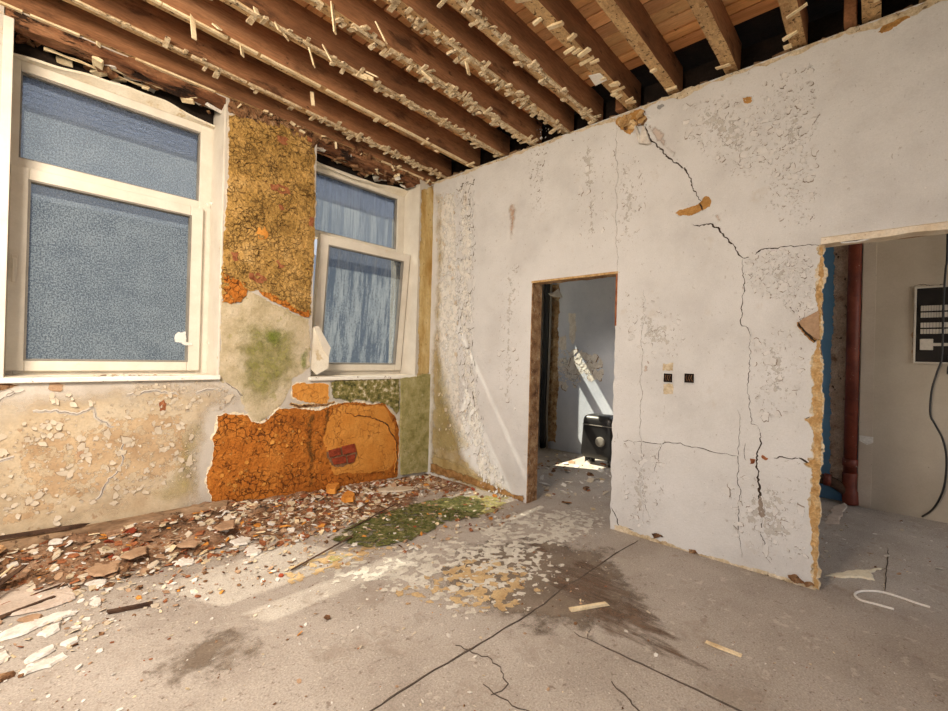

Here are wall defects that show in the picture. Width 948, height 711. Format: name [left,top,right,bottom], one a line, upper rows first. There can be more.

peeling [14,33,41,48]
peeling [56,55,166,93]
spalling [180,0,946,617]
crack [0,388,125,500]
leakage [0,291,311,541]
spalling [0,374,400,535]
crack [370,124,872,711]
leakage [443,538,687,659]